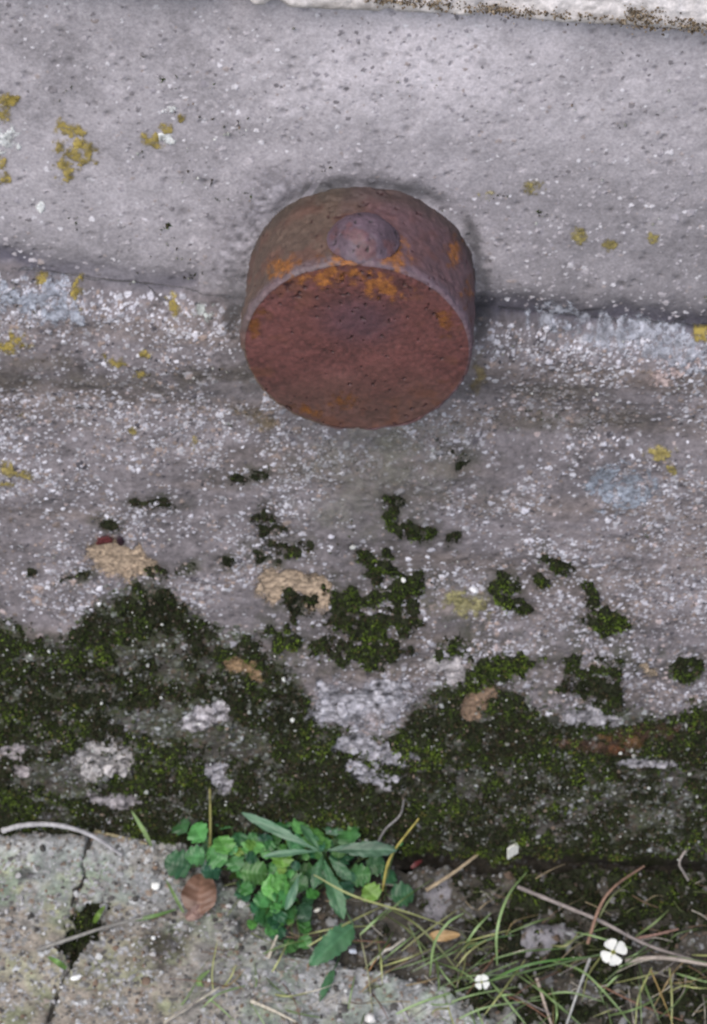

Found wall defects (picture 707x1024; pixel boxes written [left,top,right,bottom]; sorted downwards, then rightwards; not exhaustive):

rust [317,258,396,295]
crack [70,831,93,907]
crack [47,967,72,1023]